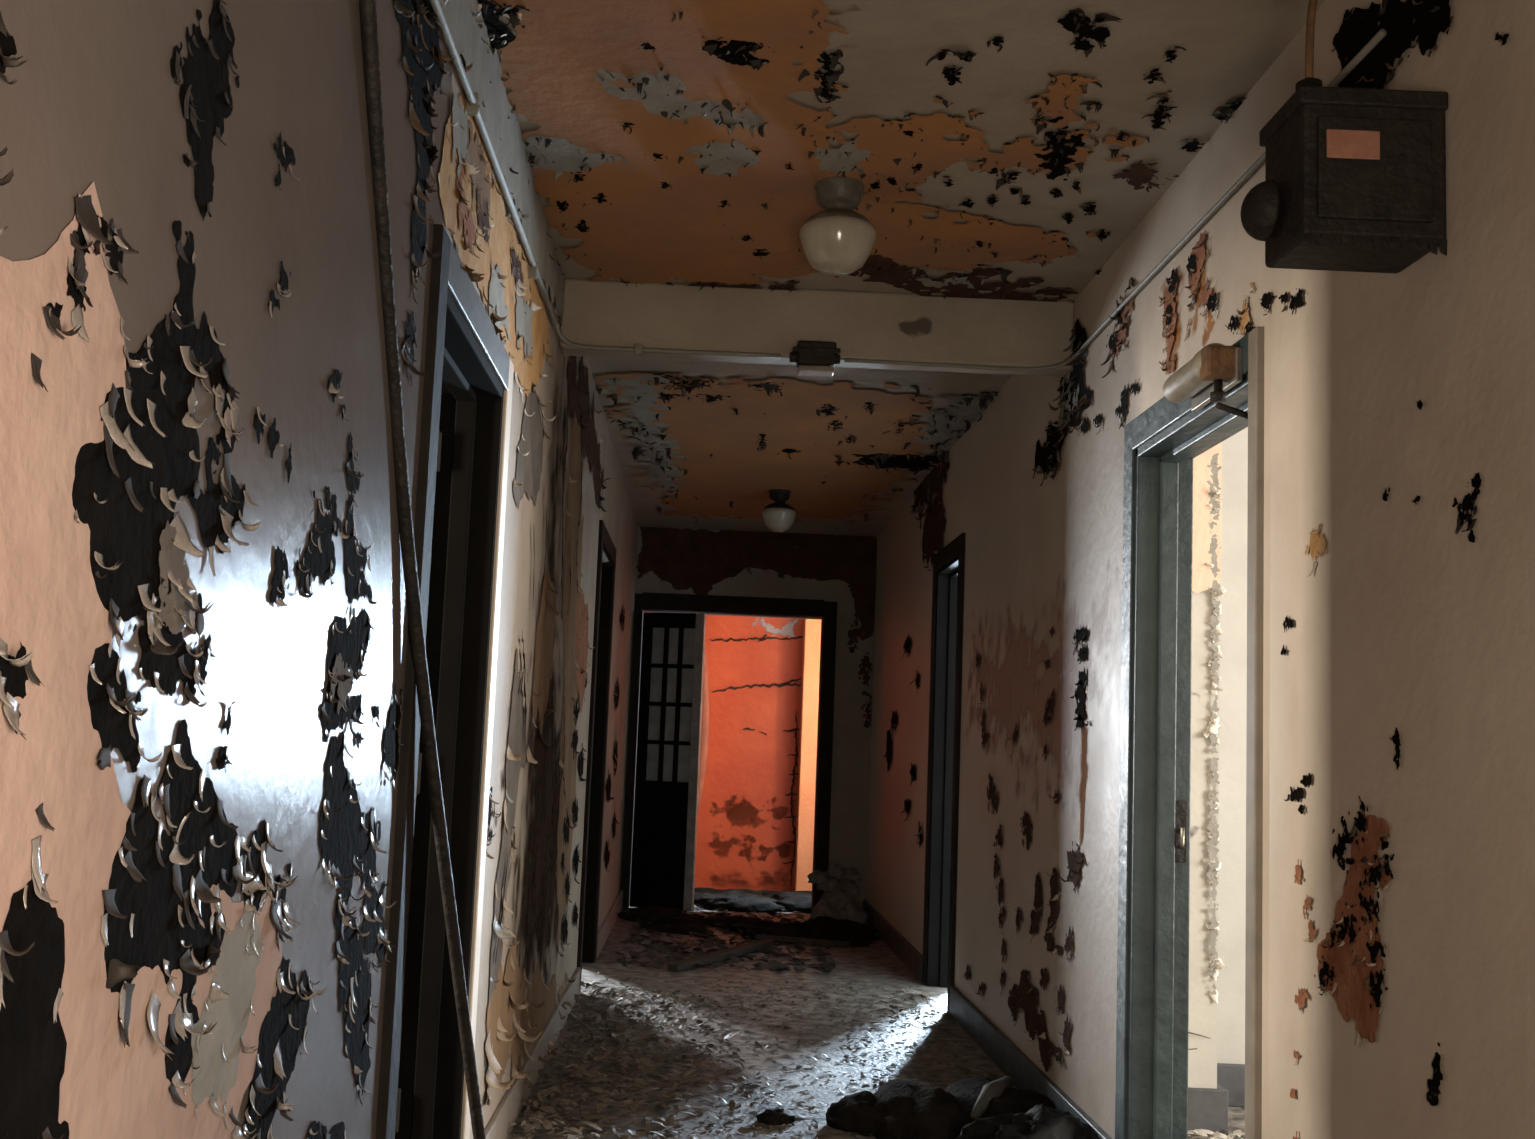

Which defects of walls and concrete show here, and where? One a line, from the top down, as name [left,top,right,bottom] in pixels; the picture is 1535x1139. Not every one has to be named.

peeling [1212,97,1247,124]
peeling [1159,233,1305,375]
peeling [0,0,407,1139]
crack [710,634,803,642]
peeling [394,0,1205,1105]
peeling [1294,796,1395,1049]